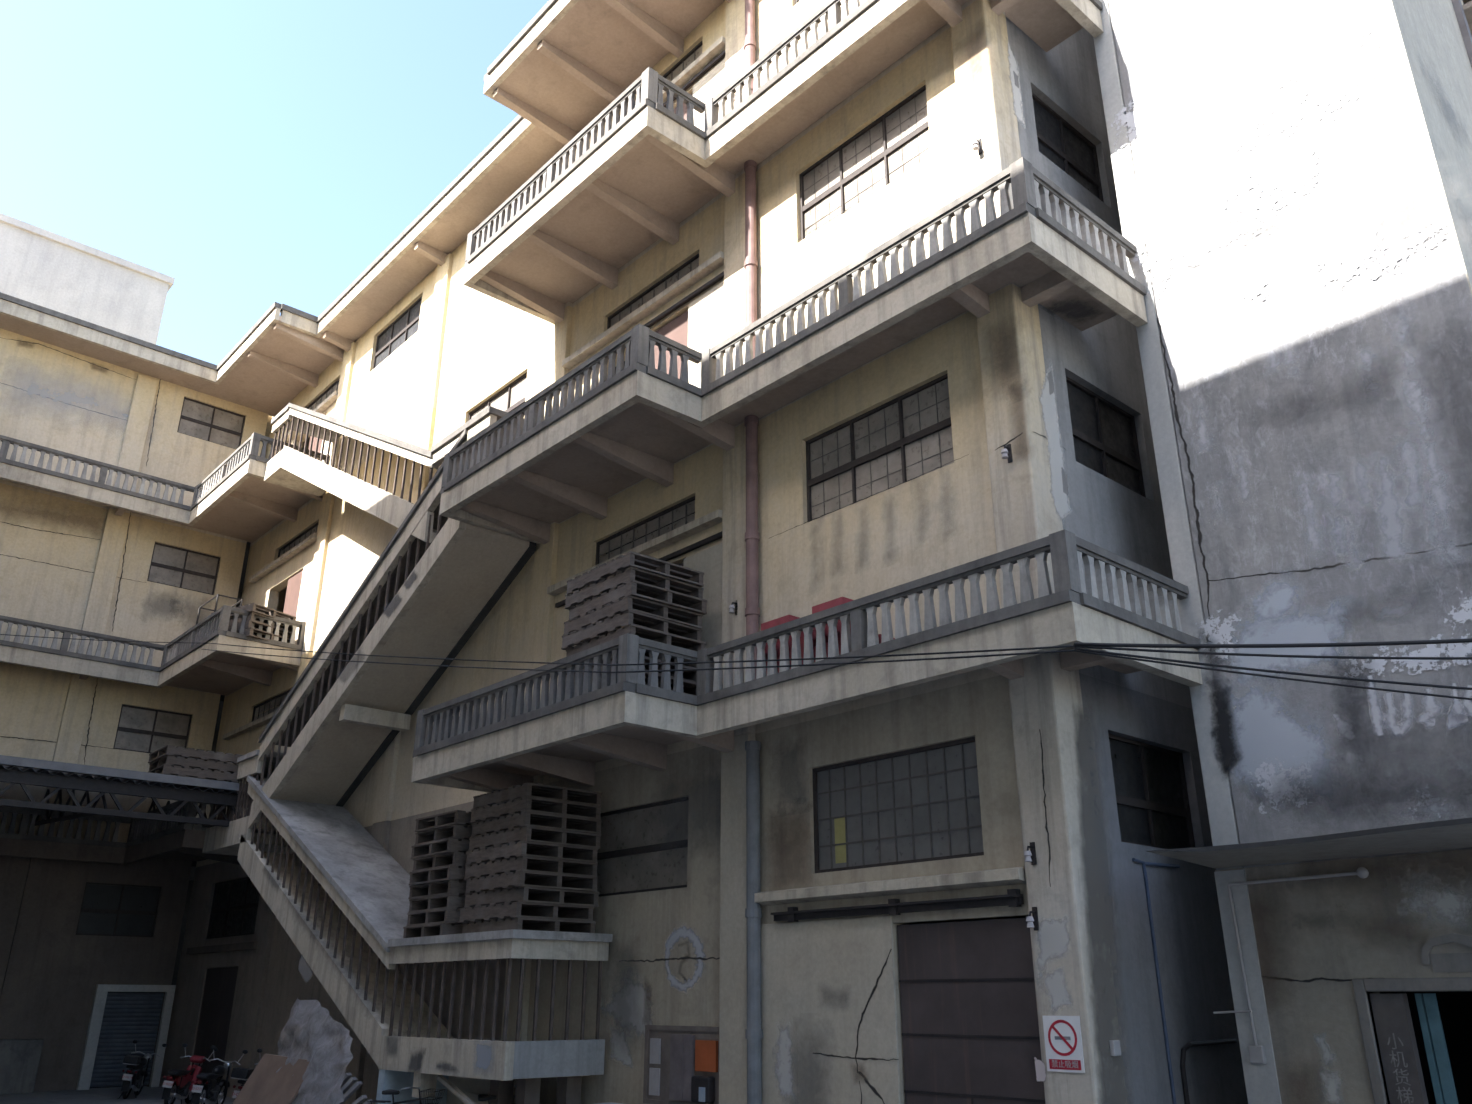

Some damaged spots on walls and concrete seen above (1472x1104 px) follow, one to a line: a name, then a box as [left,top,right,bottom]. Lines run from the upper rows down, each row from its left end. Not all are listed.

peeling [1040,367,1070,519]
crack [1157,318,1472,619]
water stain [1208,642,1240,773]
water stain [1266,775,1472,814]
crack [813,949,899,1104]
peeling [1037,919,1071,1011]